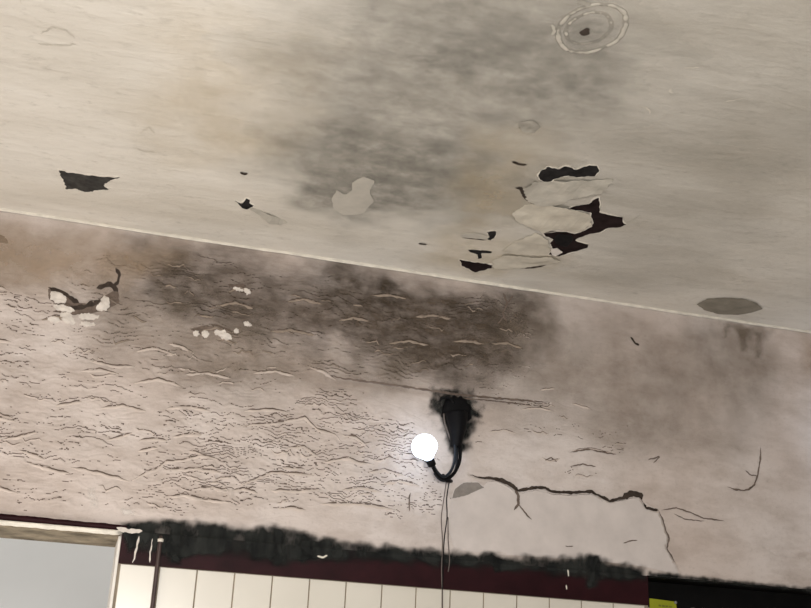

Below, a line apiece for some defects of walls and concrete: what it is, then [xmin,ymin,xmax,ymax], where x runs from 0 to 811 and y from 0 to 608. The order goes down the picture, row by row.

peeling [57,168,120,192]
peeling [234,197,287,225]
peeling [458,164,641,272]
spalling [48,268,121,327]
spalling [191,321,252,341]
leakage [149,251,540,380]
crack [546,448,615,467]
crack [729,448,761,491]
crack [473,475,723,562]
leakage [168,522,184,564]
leakage [273,528,285,565]
leakage [586,556,600,588]